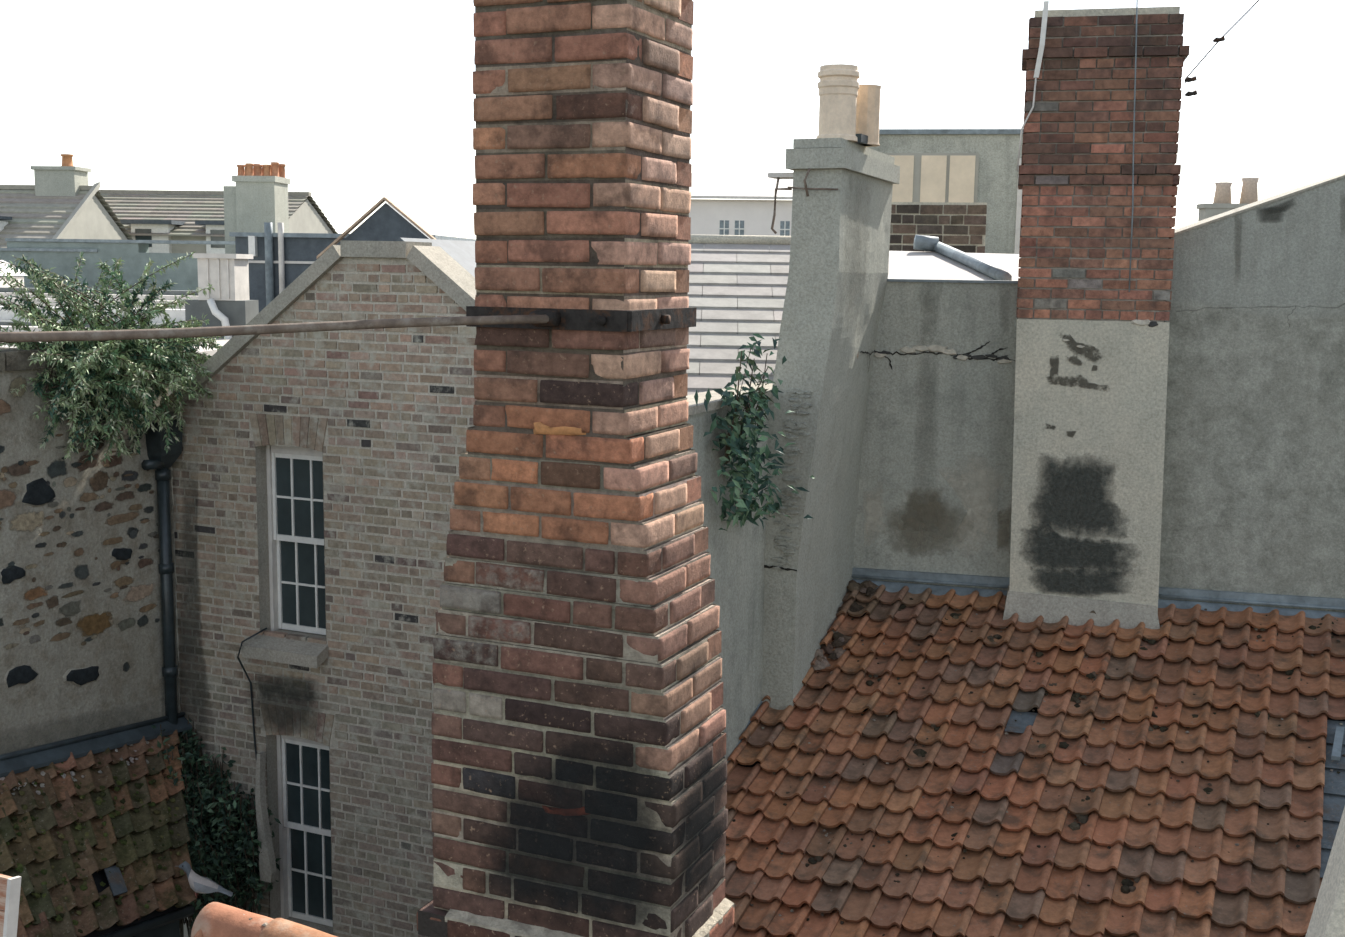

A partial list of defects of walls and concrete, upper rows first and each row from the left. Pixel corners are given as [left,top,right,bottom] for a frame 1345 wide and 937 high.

crack [860,341,1015,371]
spalling [1047,335,1107,391]